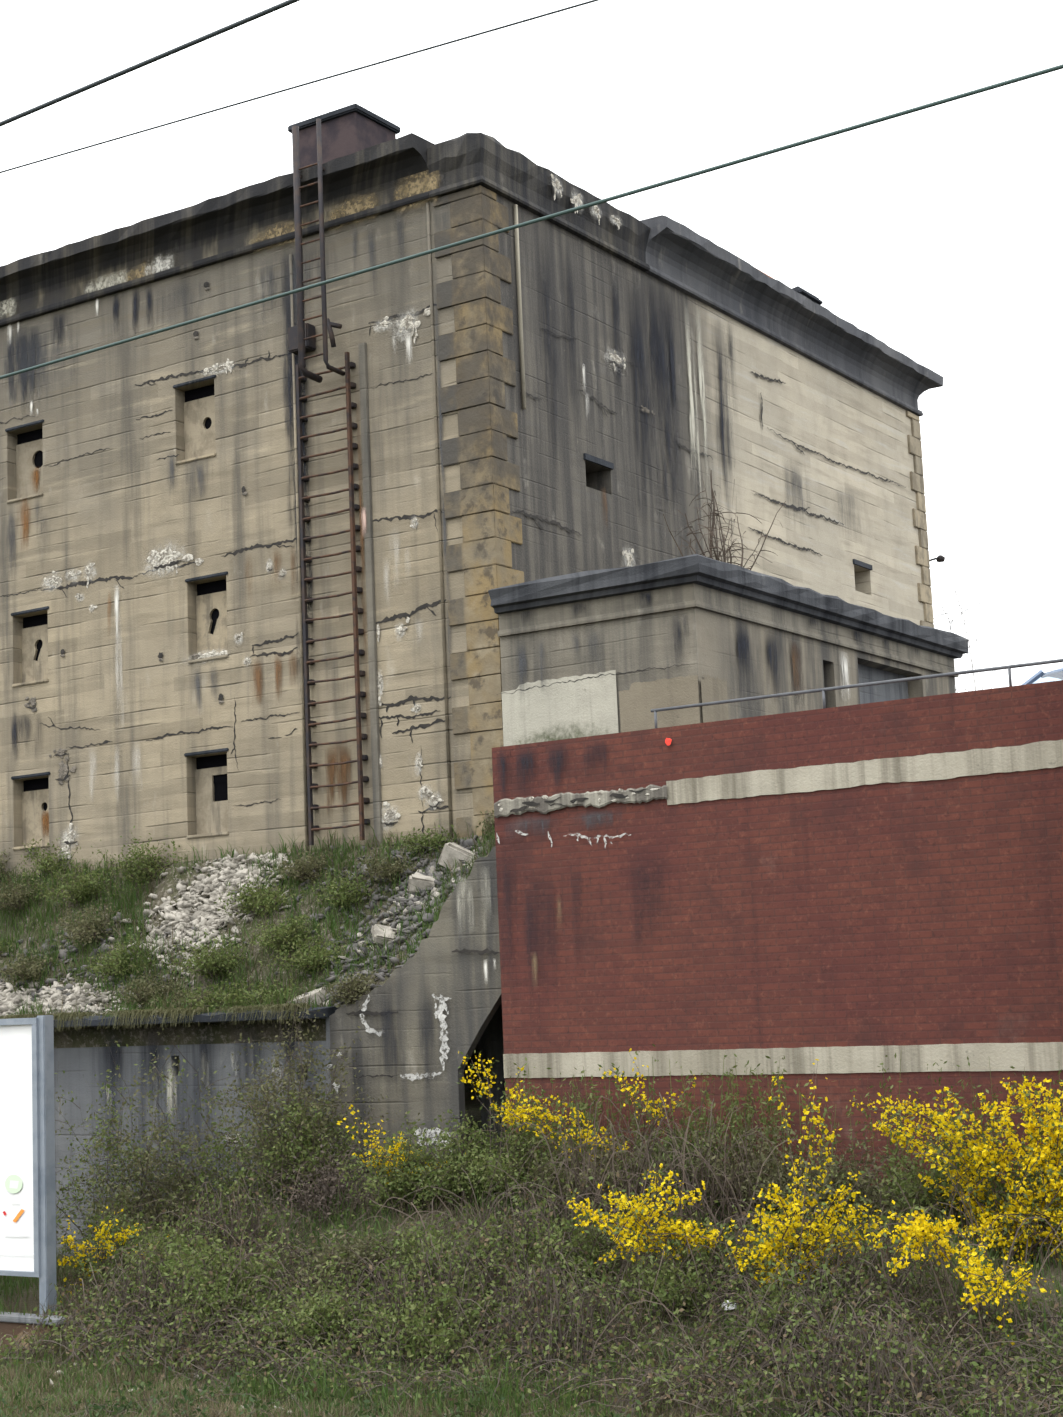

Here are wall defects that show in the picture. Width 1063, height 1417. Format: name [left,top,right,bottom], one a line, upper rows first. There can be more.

water stain [8,300,62,412]
water stain [614,291,733,493]
spalling [43,563,97,609]
crack [0,537,296,597]
spalling [147,546,204,575]
crack [379,695,451,832]
spalling [494,784,668,818]